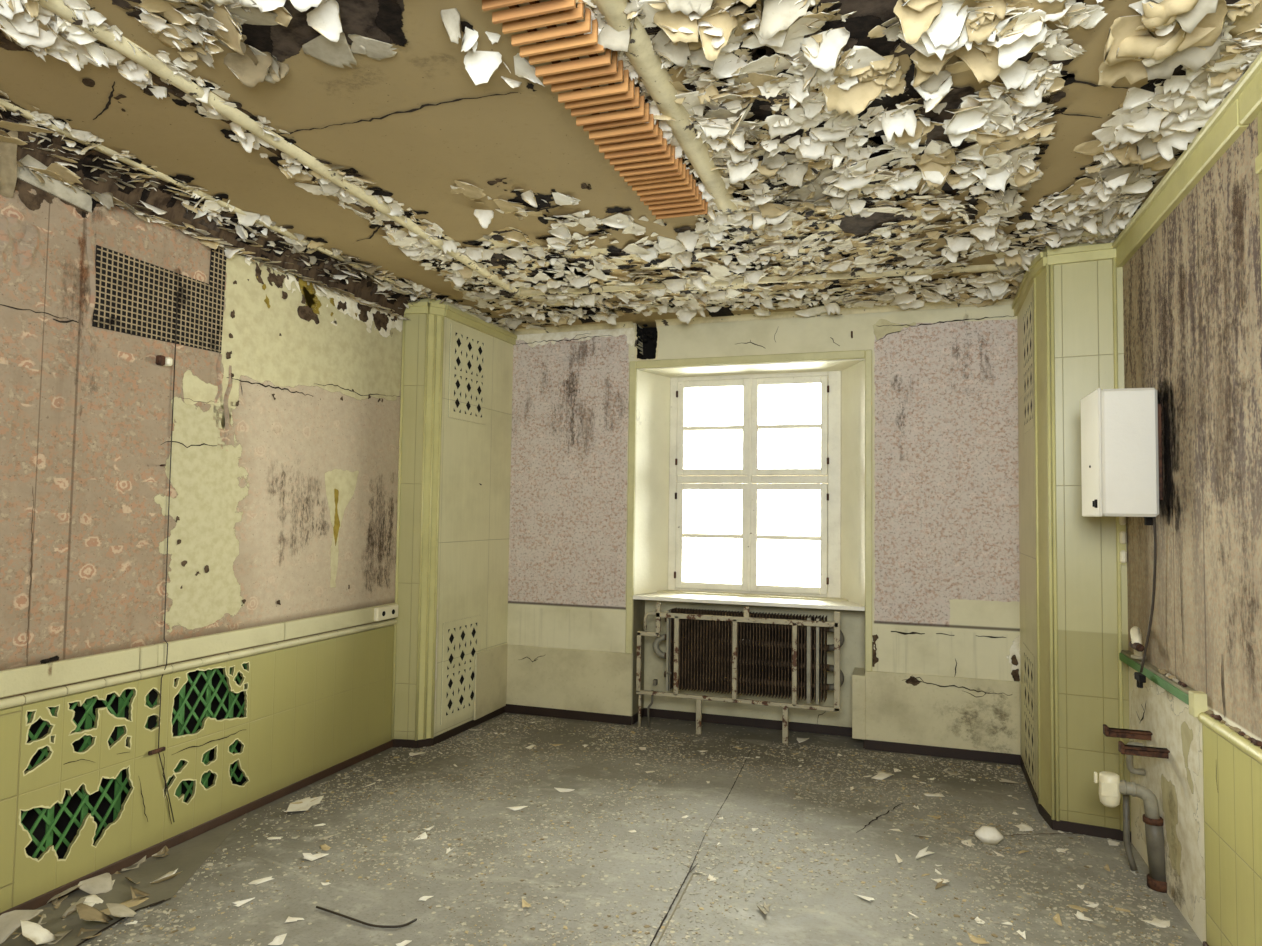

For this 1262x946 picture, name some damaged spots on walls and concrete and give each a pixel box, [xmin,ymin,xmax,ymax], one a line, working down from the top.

crack [0,304,79,323]
peeling [0,0,1262,632]
damp [1163,389,1174,524]
crack [26,489,34,658]
spalling [23,661,250,777]
crack [891,631,1010,697]
spalling [19,765,135,862]